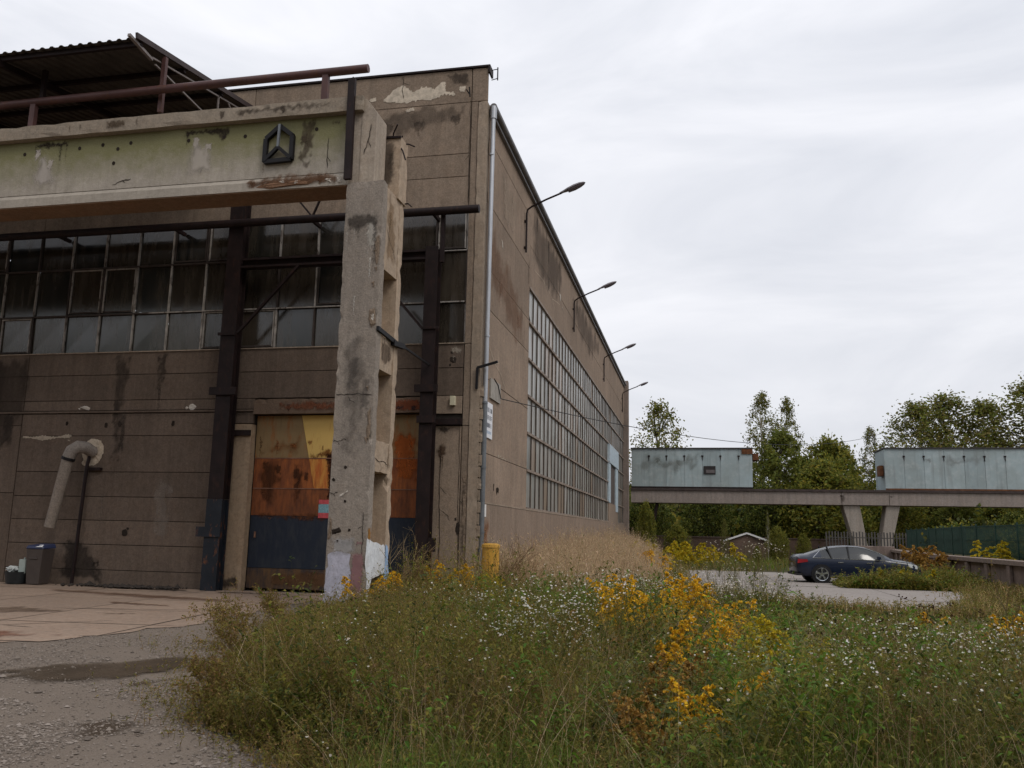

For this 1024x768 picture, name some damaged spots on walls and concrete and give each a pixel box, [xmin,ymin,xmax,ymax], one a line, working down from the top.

peeling [369,82,466,113]
leakage [187,112,229,170]
leakage [299,122,315,166]
rust [247,173,336,188]
leakage [346,214,377,275]
rust [261,462,308,501]
rust [308,441,332,498]
rust [394,434,417,478]